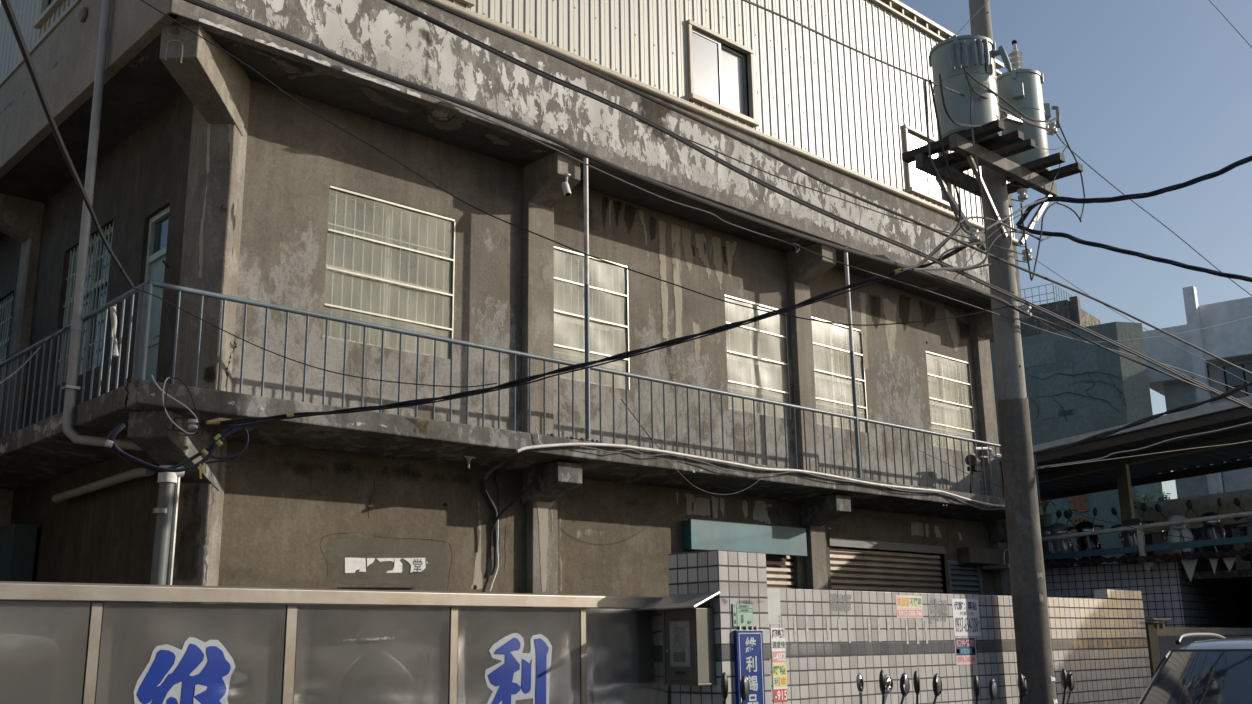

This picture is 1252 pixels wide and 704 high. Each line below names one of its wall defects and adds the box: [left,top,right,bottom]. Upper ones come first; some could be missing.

peeling [199,0,990,288]
damp [583,197,737,390]
crack [203,470,215,586]